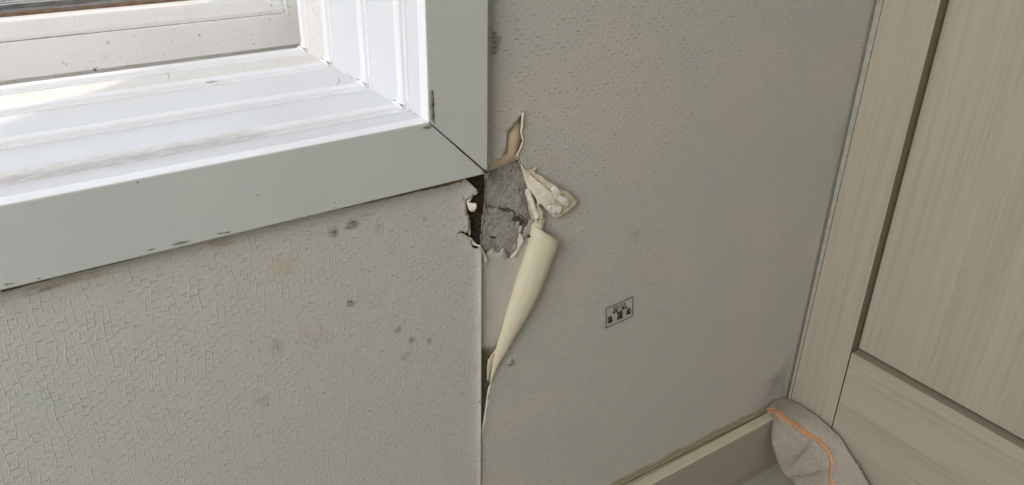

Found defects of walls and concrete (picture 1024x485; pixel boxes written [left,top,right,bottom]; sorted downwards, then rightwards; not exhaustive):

spalling [479,159,569,258]